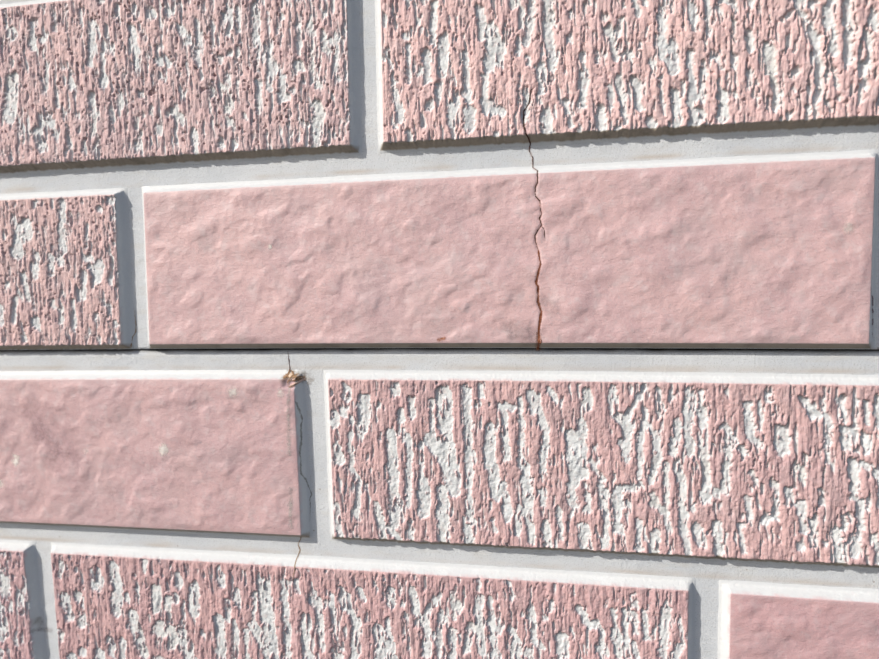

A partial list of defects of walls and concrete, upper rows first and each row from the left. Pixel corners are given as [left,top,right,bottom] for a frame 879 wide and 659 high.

crack [523,86,545,349]
crack [295,401,312,510]